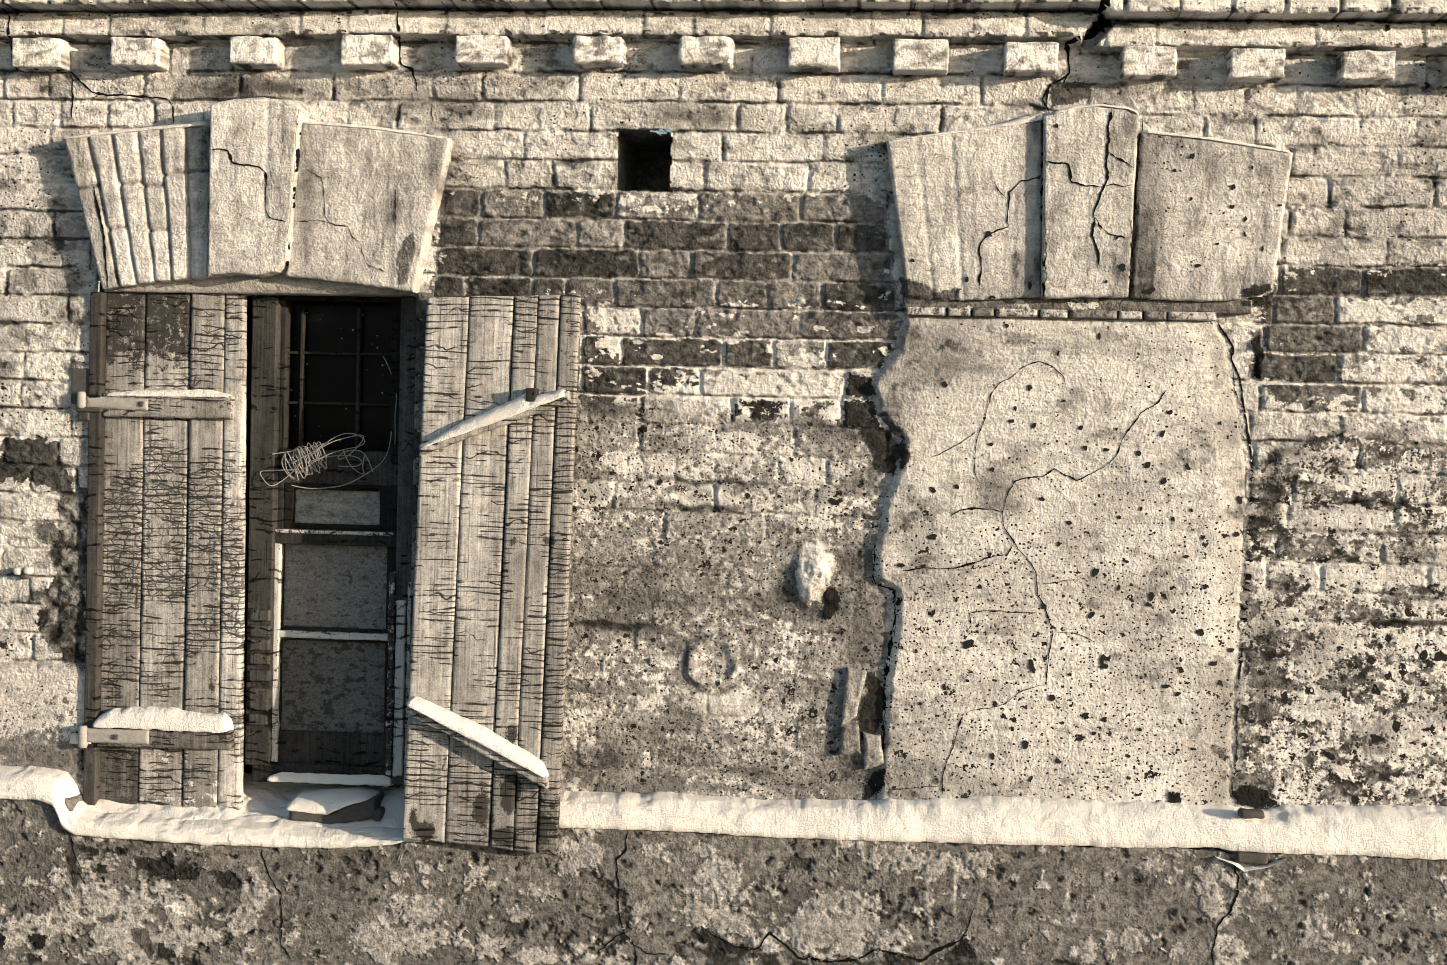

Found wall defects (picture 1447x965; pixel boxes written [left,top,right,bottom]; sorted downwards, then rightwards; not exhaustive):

crack [1,8,174,123]
crack [209,110,384,272]
spalling [396,232,415,284]
peeling [429,183,969,475]
crack [978,0,1143,297]
peeling [1242,261,1447,440]
peeling [0,434,87,673]
crack [845,361,1166,793]
spalling [1077,713,1107,741]
spalling [1099,654,1111,669]
crack [705,895,978,965]
crack [1173,847,1240,965]